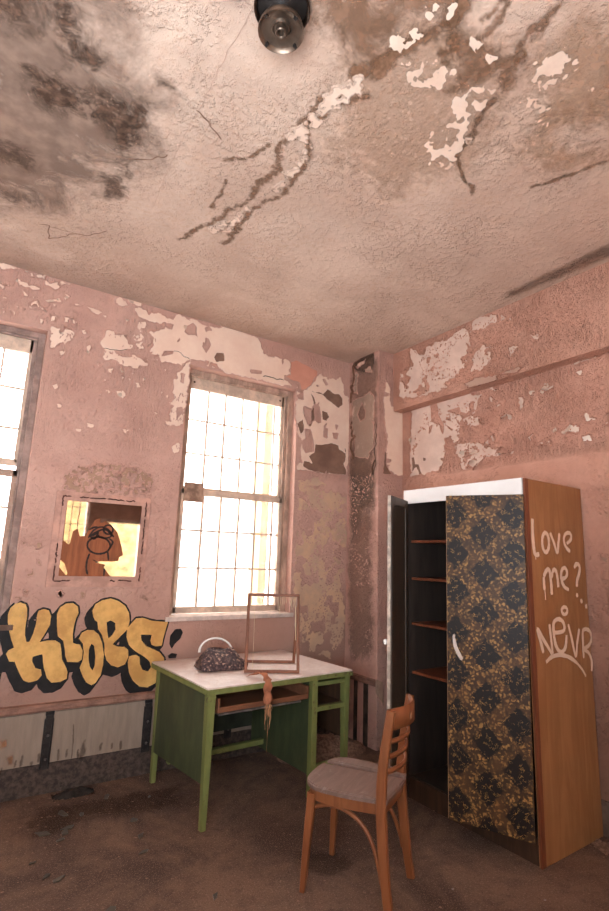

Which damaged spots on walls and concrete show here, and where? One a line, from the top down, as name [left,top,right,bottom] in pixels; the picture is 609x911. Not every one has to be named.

leakage [0,0,154,208]
leakage [180,95,327,245]
spalling [264,74,365,196]
spalling [389,28,457,90]
leakage [313,0,563,193]
spalling [425,2,458,21]
spalling [424,85,496,170]
spalling [469,36,498,65]
spalling [524,47,579,127]
leakage [531,161,606,188]
peeling [0,262,555,478]
leakage [354,353,374,372]